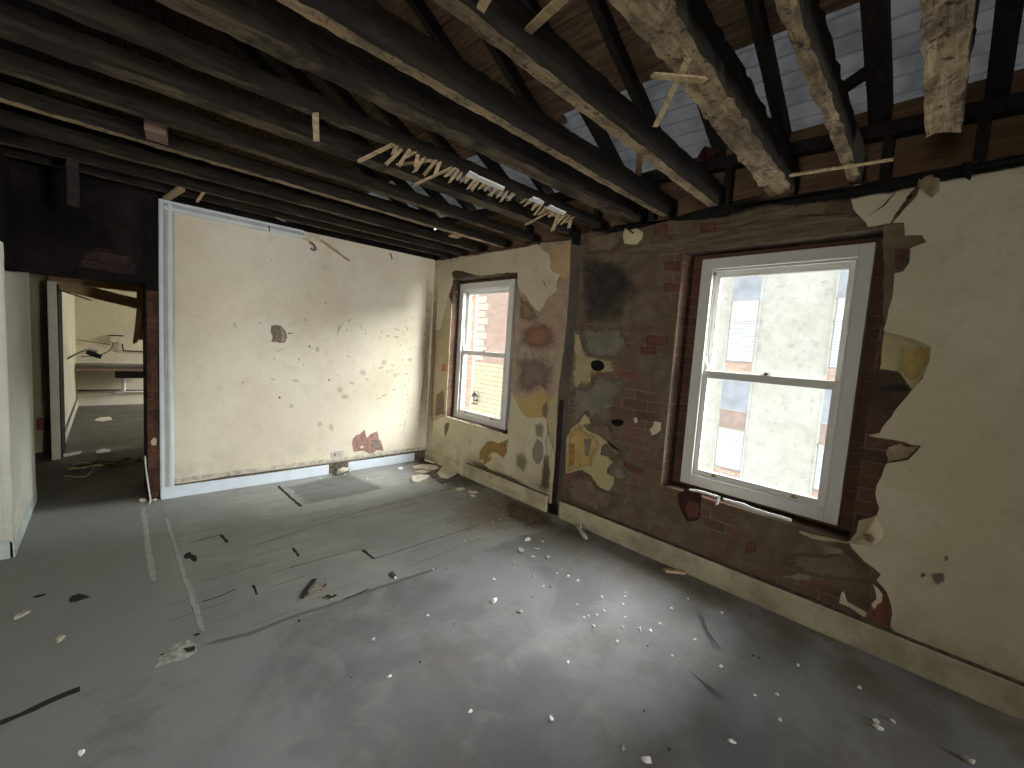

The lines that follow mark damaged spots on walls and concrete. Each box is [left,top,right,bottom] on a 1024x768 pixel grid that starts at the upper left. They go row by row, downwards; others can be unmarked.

crack [869,184,920,223]
spalling [917,175,940,198]
spalling [452,270,477,278]
spalling [271,325,293,343]
spalling [430,296,452,437]
flaking render [511,197,931,630]
peeling [330,430,383,458]
damp [541,457,550,491]